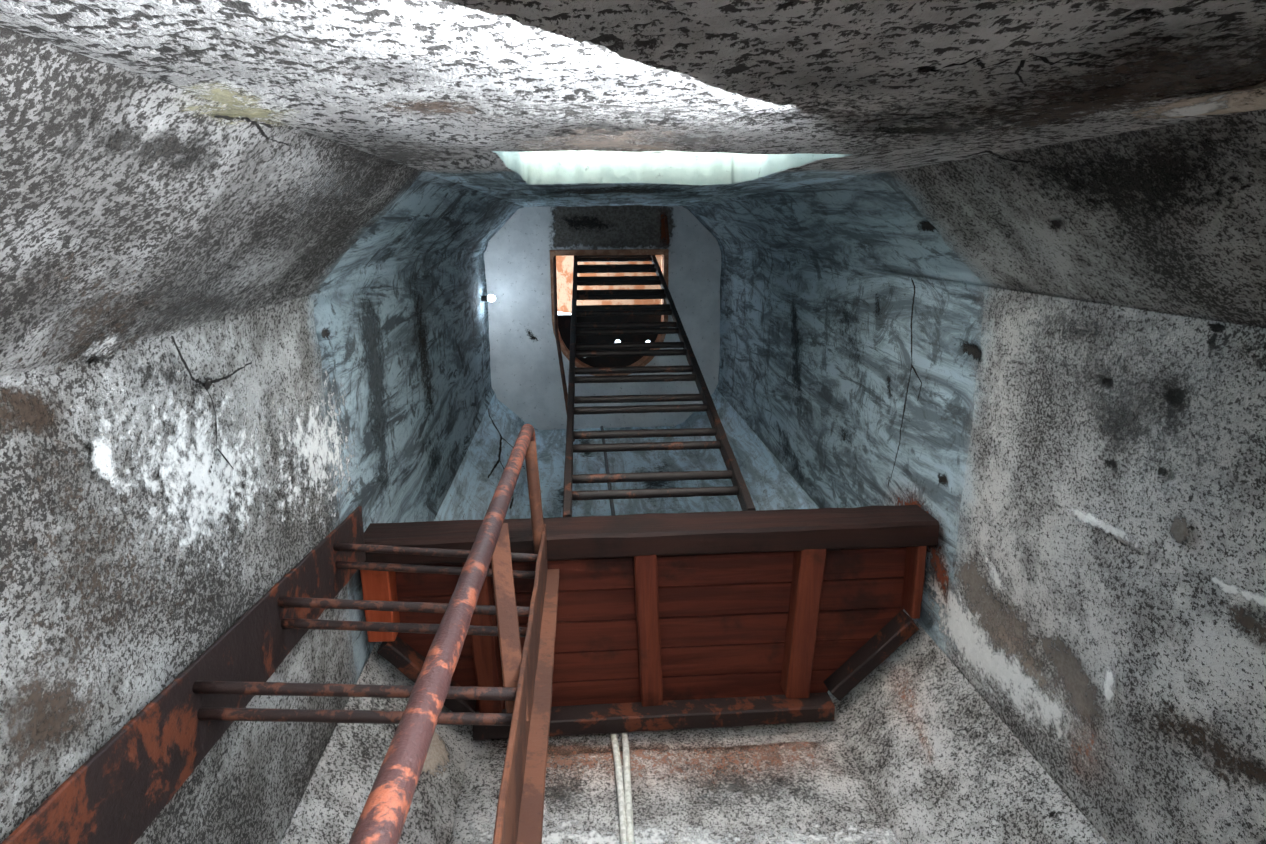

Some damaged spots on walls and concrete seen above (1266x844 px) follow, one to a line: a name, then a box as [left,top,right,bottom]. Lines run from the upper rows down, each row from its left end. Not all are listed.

flaking render [1124,82,1266,119]
crack [171,336,252,473]